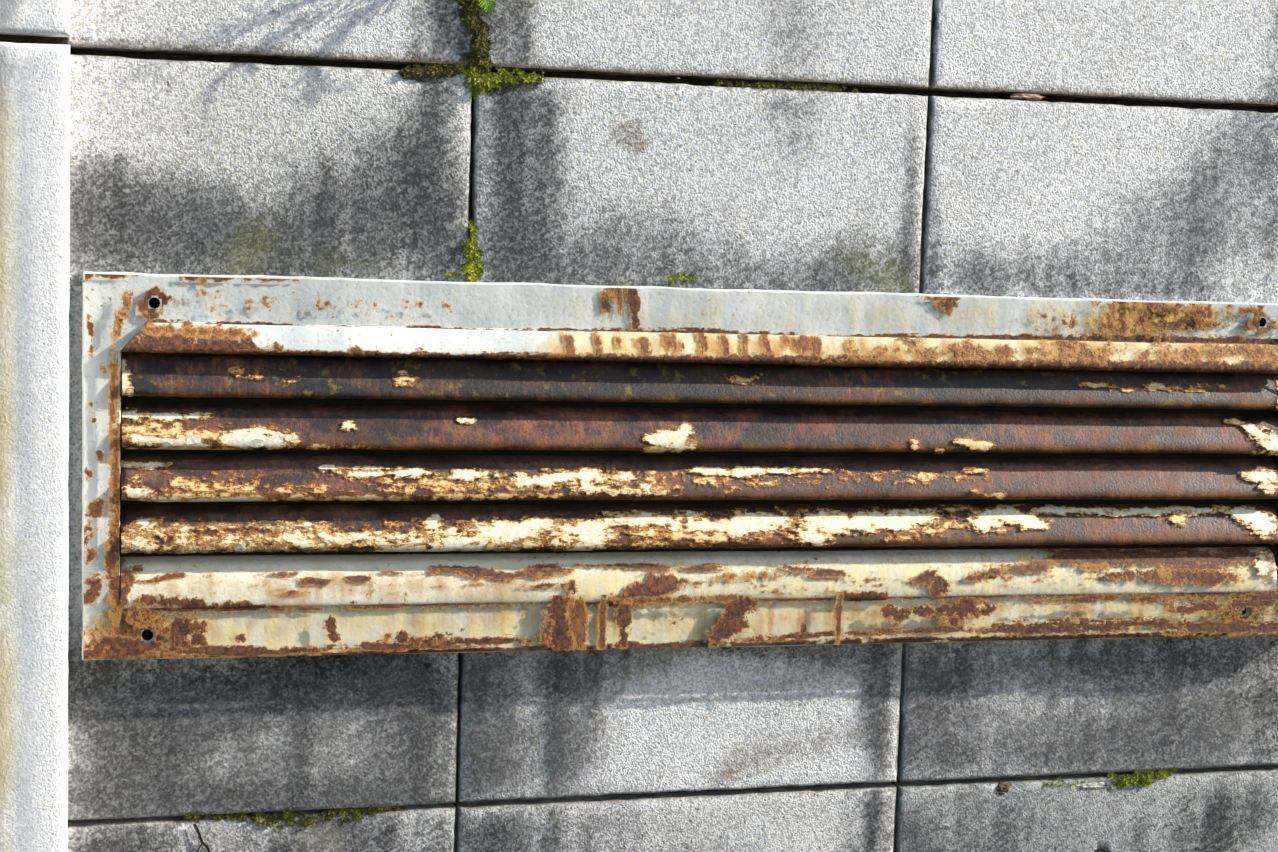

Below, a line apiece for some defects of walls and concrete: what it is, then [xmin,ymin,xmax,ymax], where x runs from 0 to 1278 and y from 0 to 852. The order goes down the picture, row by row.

damp [483,0,533,67]
damp [70,0,469,281]
damp [476,83,1278,298]
corrosion [83,274,1278,660]
peeling [121,355,1278,585]
damp [68,647,531,852]
damp [537,649,632,788]
crack [193,824,210,852]
damp [459,810,561,852]
damp [854,790,884,852]
damp [901,812,936,852]
damp [1178,787,1271,852]